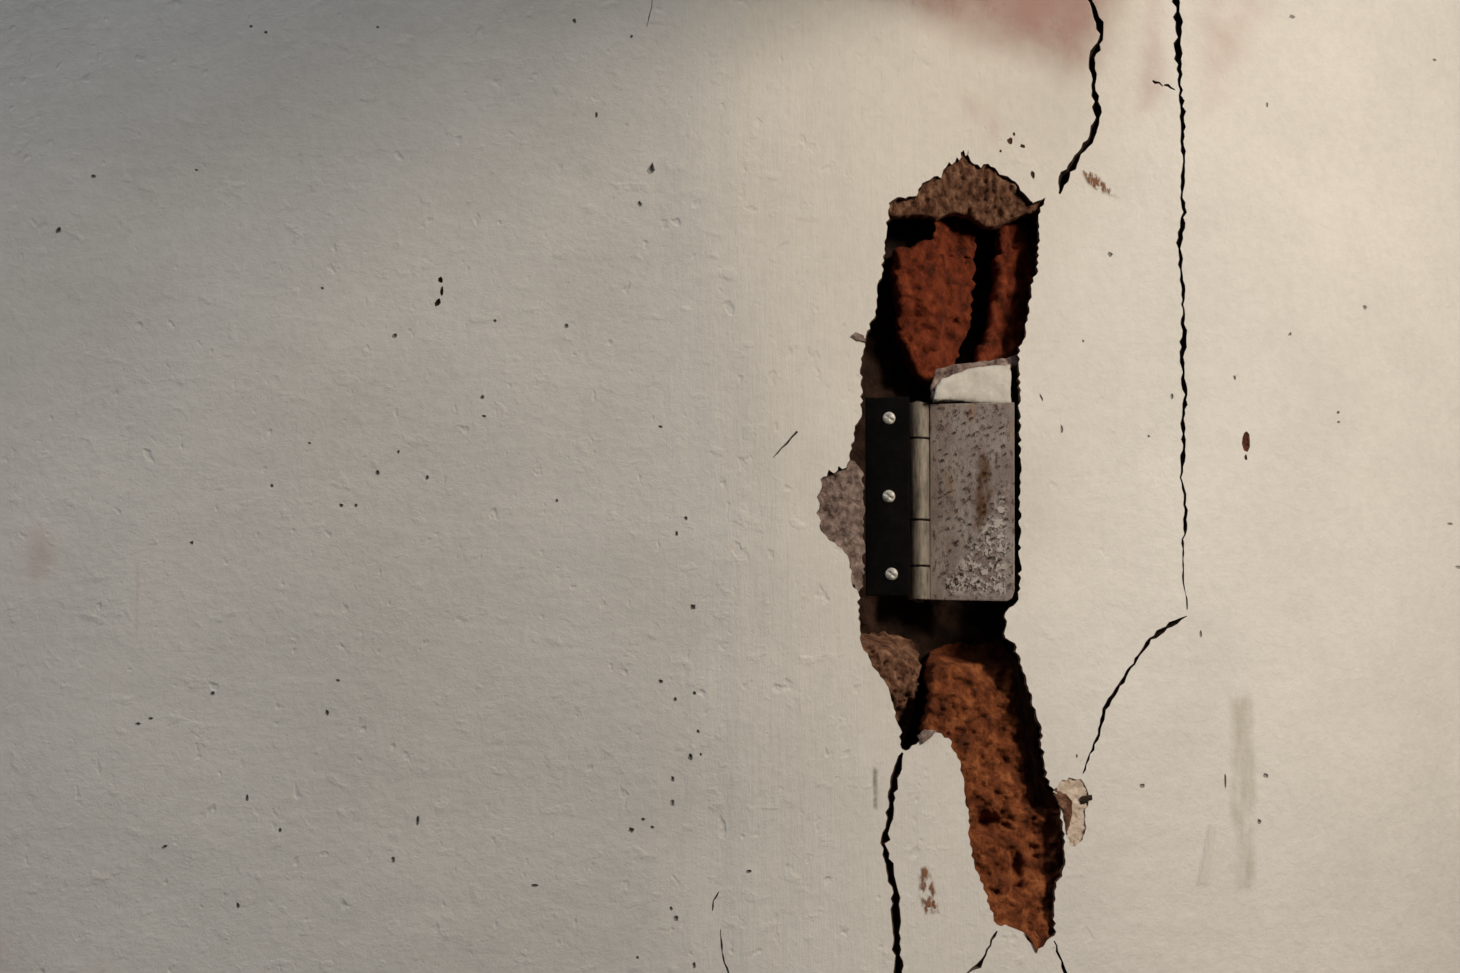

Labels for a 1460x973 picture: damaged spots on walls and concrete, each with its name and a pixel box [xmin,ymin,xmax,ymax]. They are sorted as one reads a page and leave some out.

crack [1058,0,1104,194]
crack [1083,0,1188,773]
spalling [816,132,1092,952]
corrosion [939,407,1011,598]
crack [880,753,904,973]
crack [967,931,998,973]
crack [1054,941,1067,973]